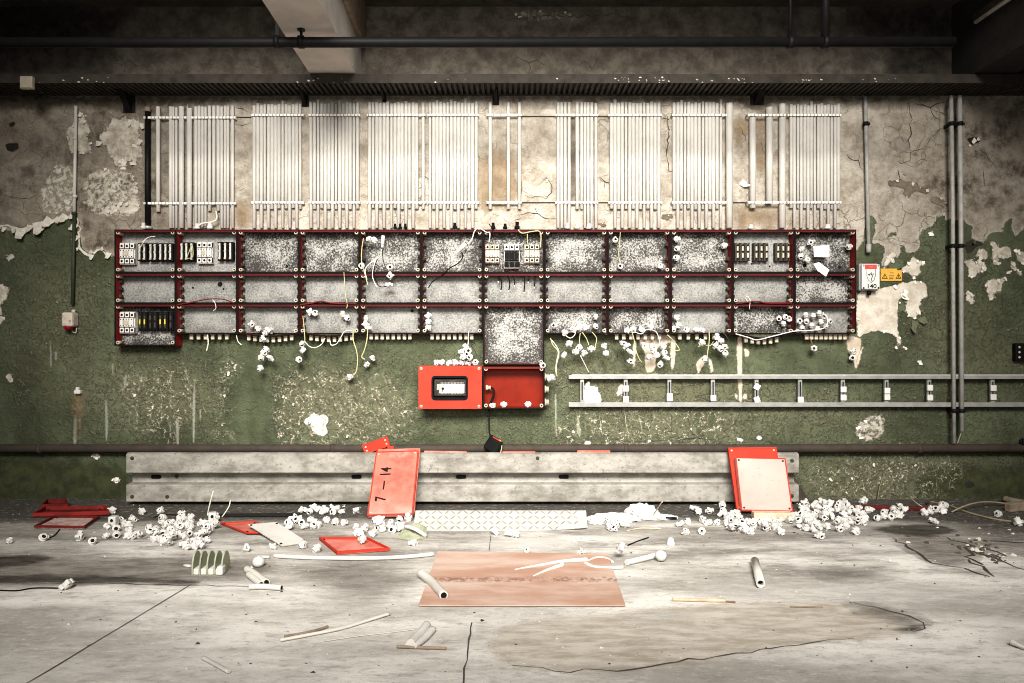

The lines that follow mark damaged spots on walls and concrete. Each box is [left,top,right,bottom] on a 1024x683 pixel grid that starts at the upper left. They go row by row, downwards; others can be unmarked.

crack [898,102,944,179]
peeling [0,112,144,260]
peeling [964,240,1024,304]
peeling [856,251,928,351]
peeling [304,413,329,436]
peeling [855,415,885,441]
crack [894,537,1024,576]
crack [854,602,926,632]
crack [514,638,850,673]